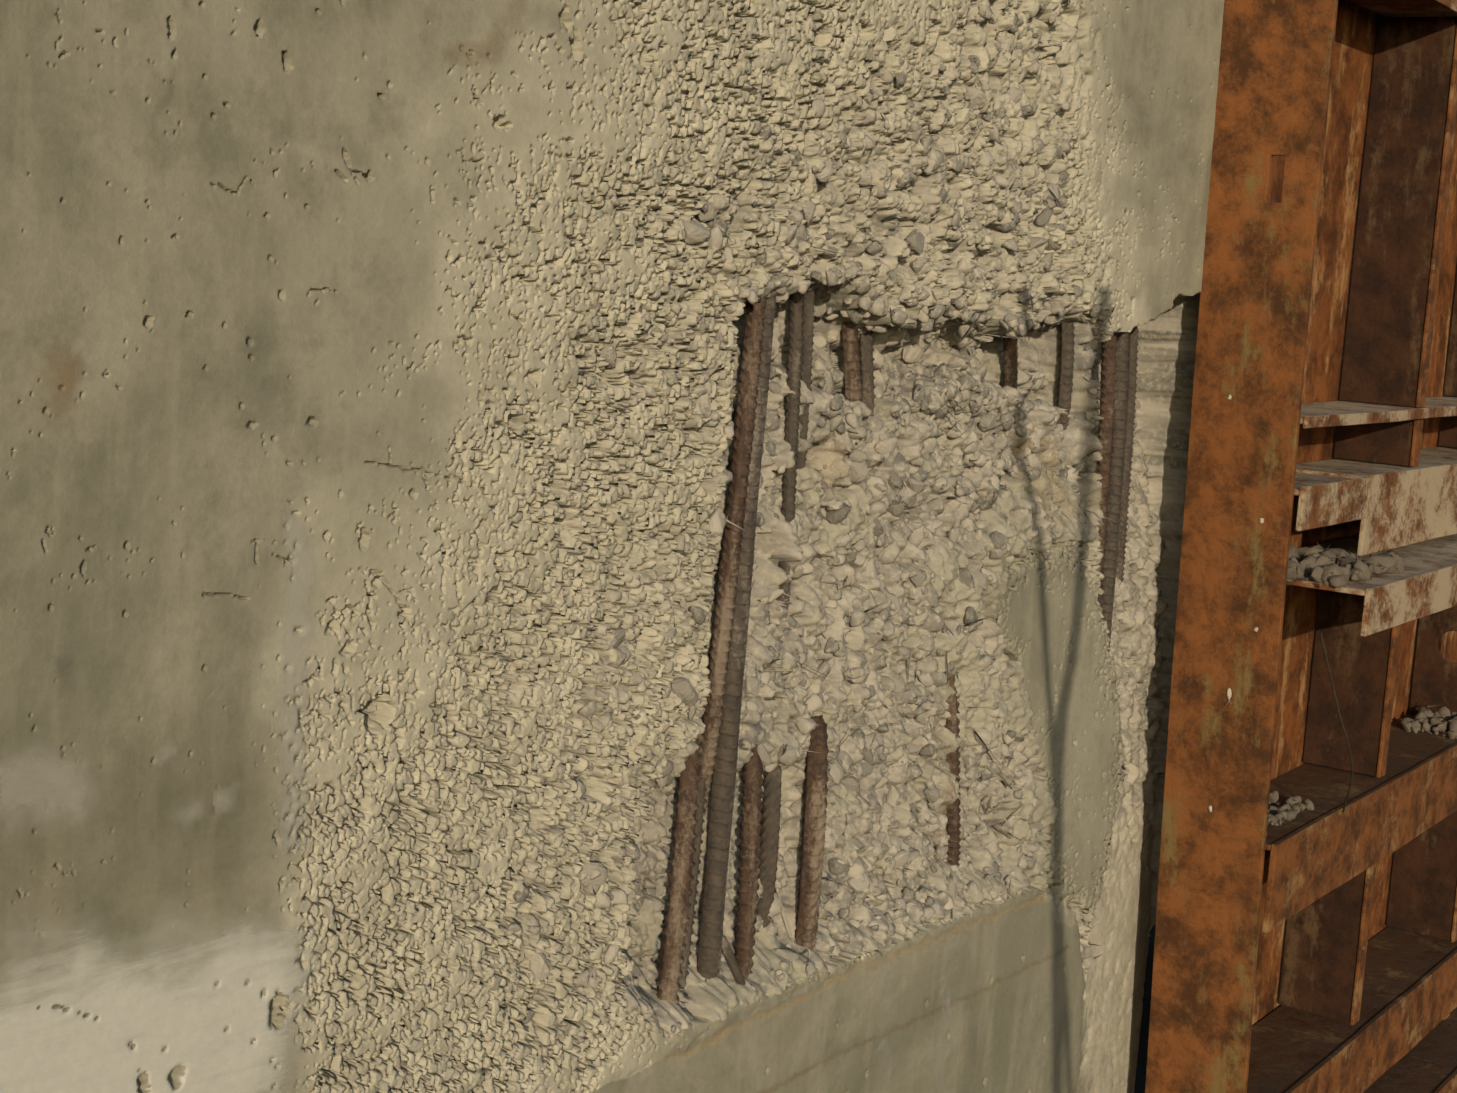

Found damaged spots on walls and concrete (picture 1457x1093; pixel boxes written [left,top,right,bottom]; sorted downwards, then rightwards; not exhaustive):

hole [325,618,358,656]
spalling [621,261,1200,1093]